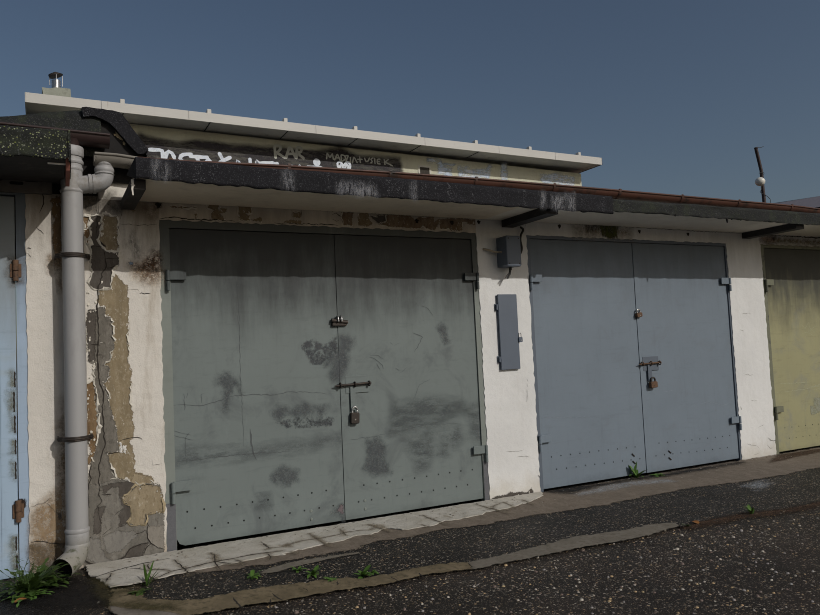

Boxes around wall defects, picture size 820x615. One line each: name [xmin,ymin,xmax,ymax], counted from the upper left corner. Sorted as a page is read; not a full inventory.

peeling [161,204,262,223]
peeling [277,211,475,232]
leakage [136,256,158,278]
peeling [84,211,166,568]
crack [85,198,388,582]